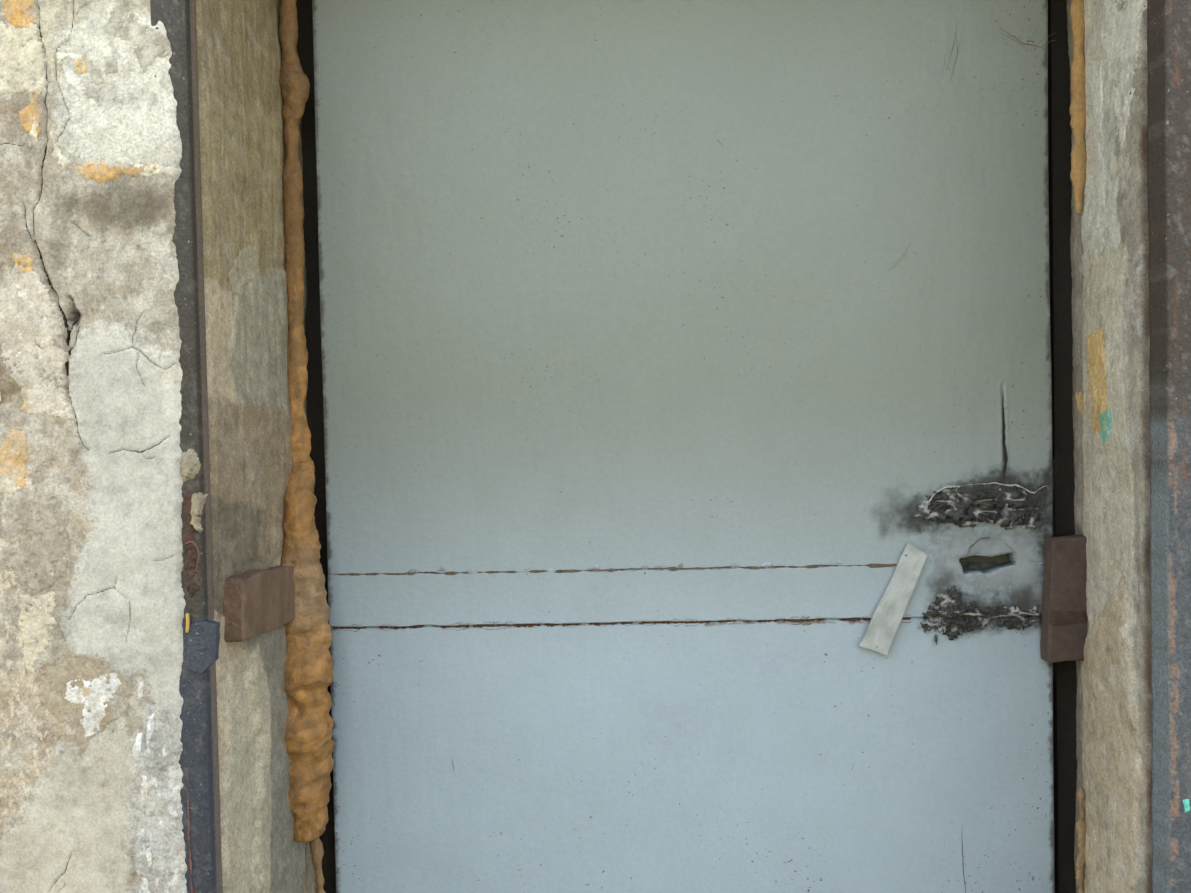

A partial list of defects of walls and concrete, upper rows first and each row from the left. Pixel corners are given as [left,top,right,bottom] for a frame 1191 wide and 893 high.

crack [0,0,170,459]
crack [71,582,130,643]